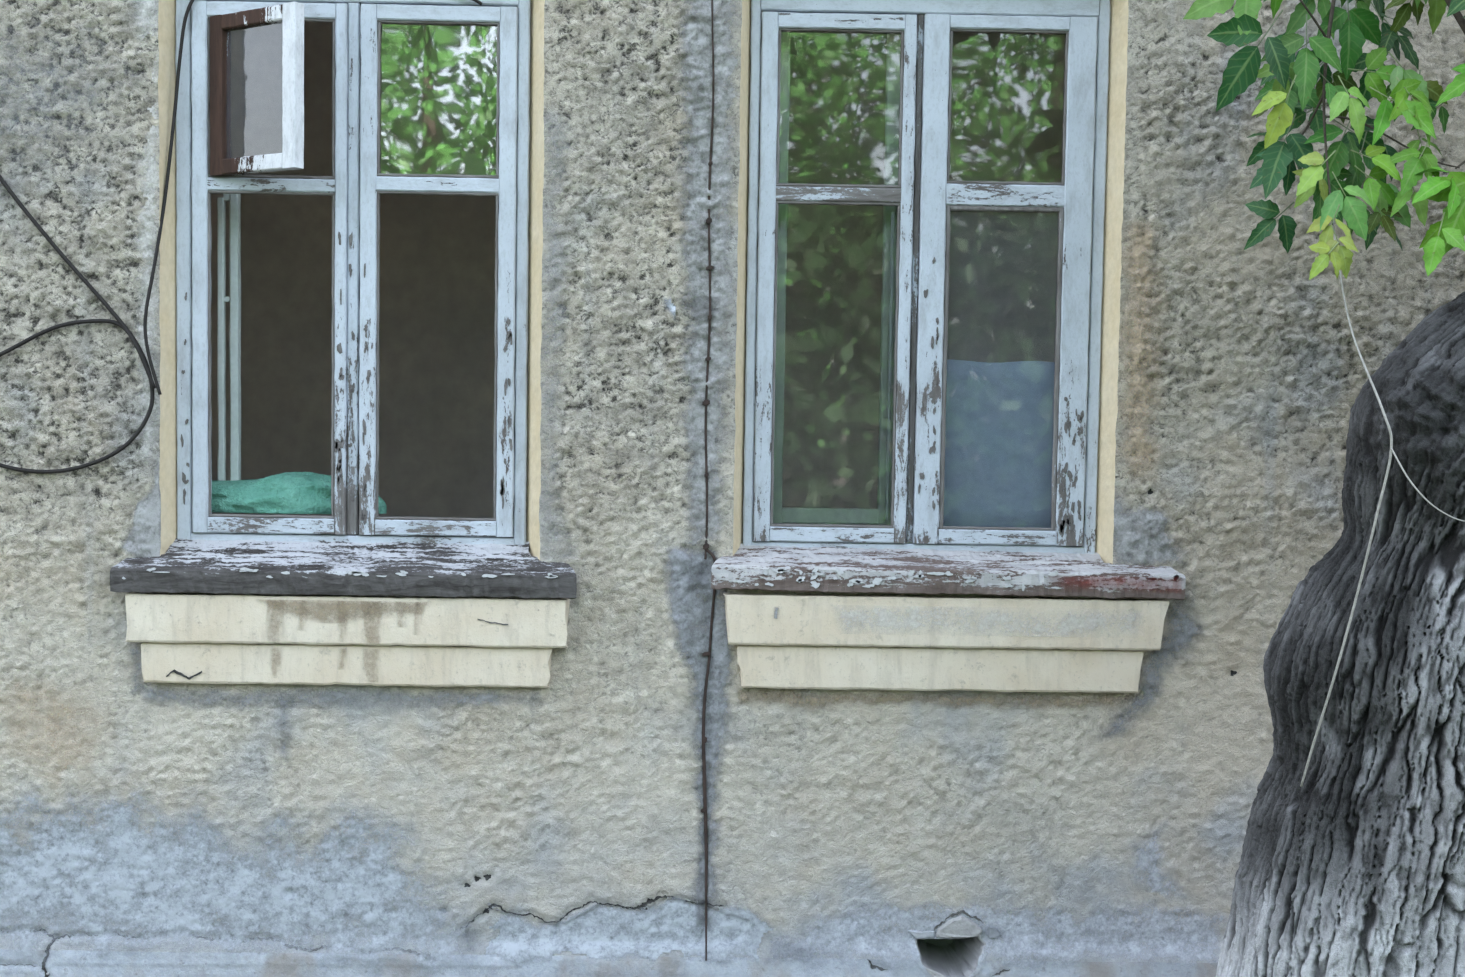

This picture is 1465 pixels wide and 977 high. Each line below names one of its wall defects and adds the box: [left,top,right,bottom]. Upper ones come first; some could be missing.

peeling [338,232,366,305]
peeling [337,324,371,399]
peeling [335,412,369,525]
peeling [500,415,513,509]
peeling [1059,397,1084,536]
peeling [733,567,977,588]
leakage [267,600,421,642]
leakage [486,549,1222,968]
crack [0,929,436,977]
leakage [0,796,468,977]
crack [460,895,724,934]
spalling [908,910,1001,977]